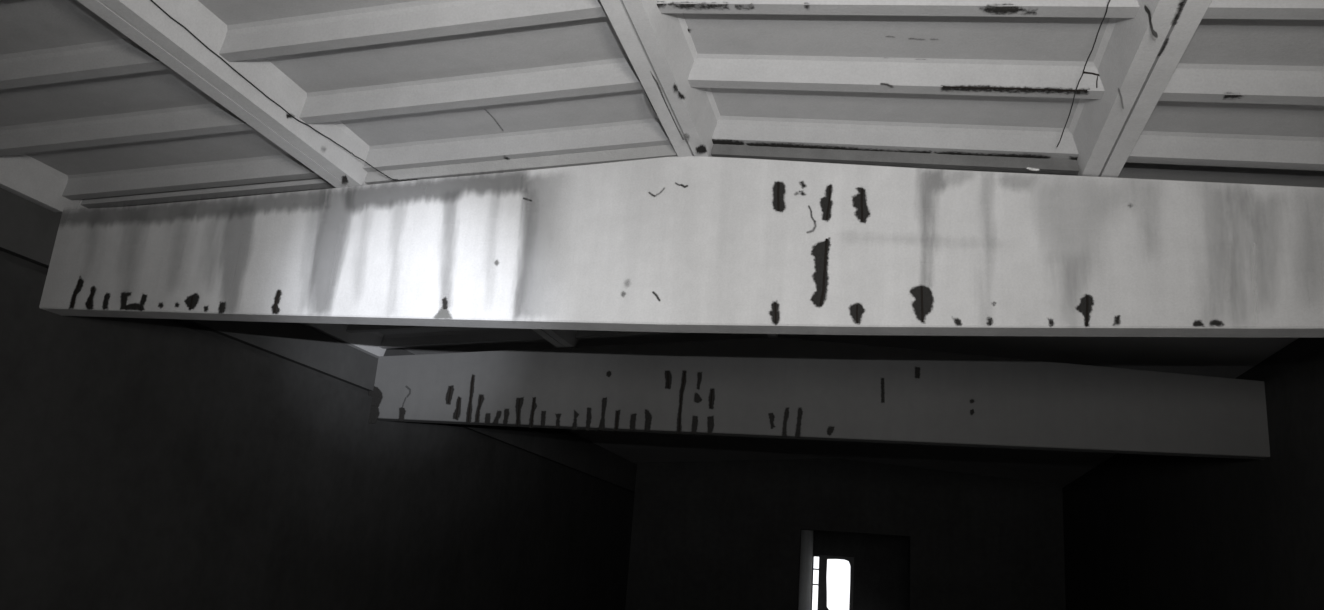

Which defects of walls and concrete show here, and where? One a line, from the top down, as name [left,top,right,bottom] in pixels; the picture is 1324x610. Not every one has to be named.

spalling [984,4,1036,15]
crack [1144,0,1185,56]
spalling [941,71,1100,95]
leakage [347,174,523,209]
spalling [772,181,806,212]
spalling [820,184,832,221]
spalling [852,187,870,223]
spalling [811,238,831,307]
spalling [69,278,226,314]
spalling [910,286,934,322]
spalling [1076,294,1094,326]
spalling [446,375,652,431]